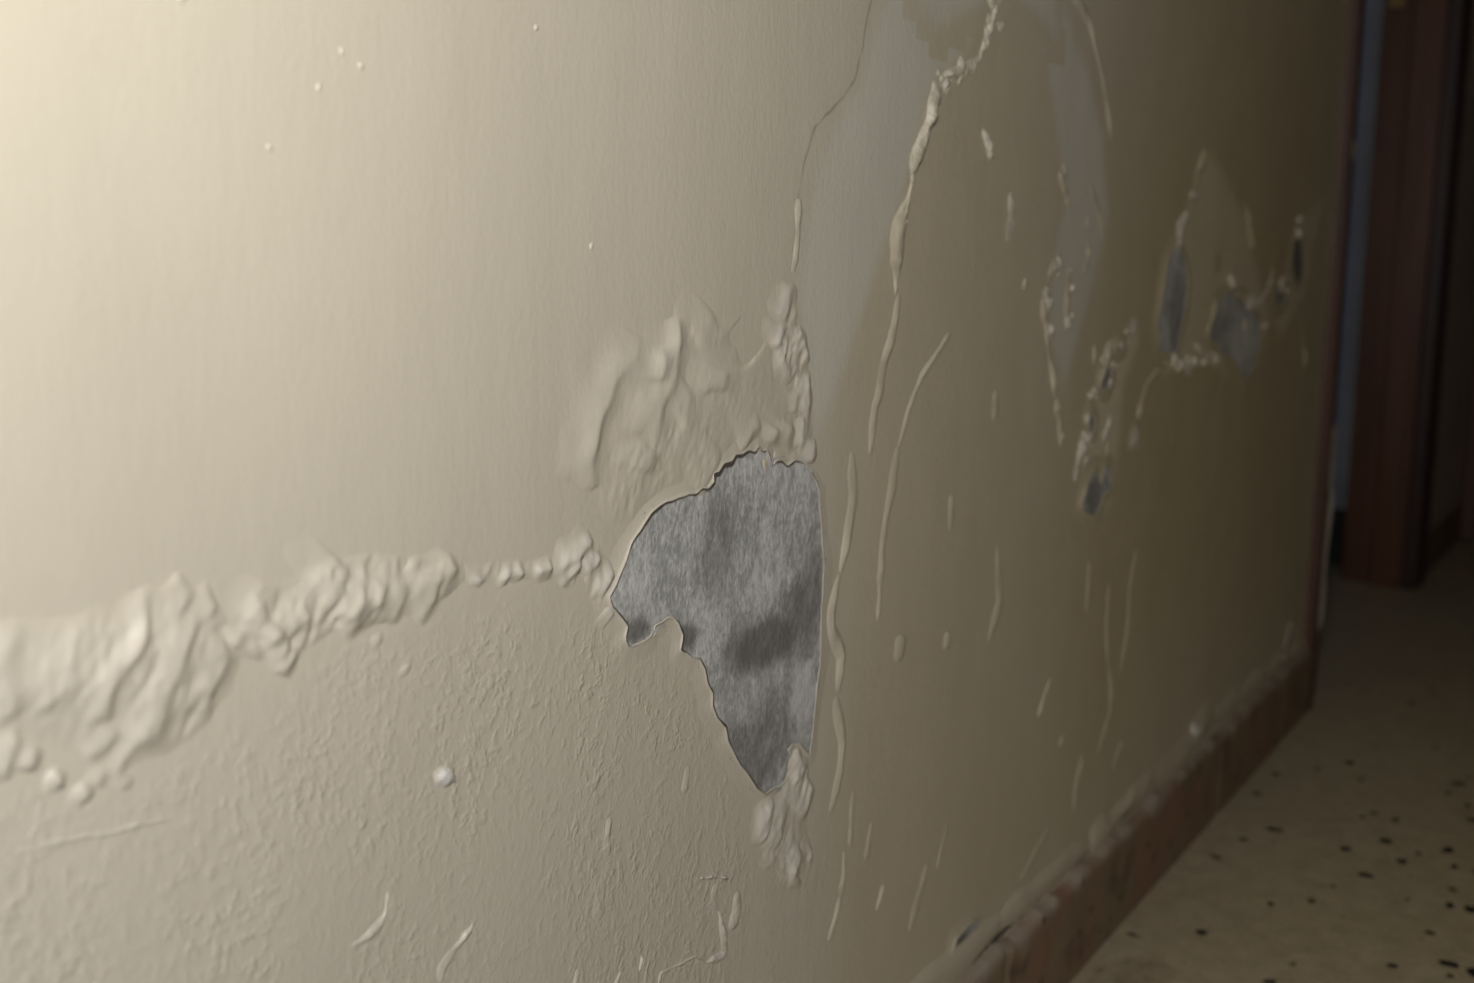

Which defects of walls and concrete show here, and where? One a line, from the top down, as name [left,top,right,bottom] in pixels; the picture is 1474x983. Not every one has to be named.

water stain [777,0,1331,549]
flaking render [1022,214,1222,529]
peeling [1213,208,1308,368]
flaking render [592,437,833,804]